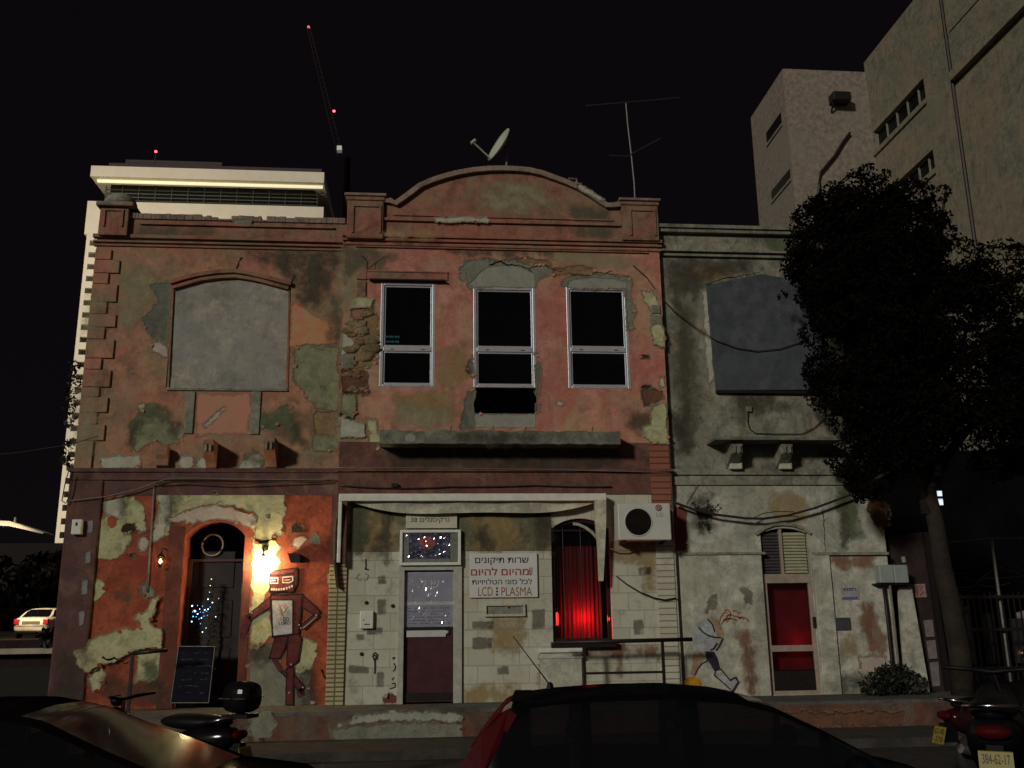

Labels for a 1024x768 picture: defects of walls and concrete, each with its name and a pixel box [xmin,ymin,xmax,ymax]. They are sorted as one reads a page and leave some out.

flaking render [140,280,173,358]
flaking render [457,255,666,359]
peeling [97,391,295,468]
flaking render [289,295,383,450]
flaking render [450,352,543,431]
flaking render [640,375,670,445]
flaking render [73,484,321,742]
corrosion [861,602,886,653]
flaking render [328,693,464,740]